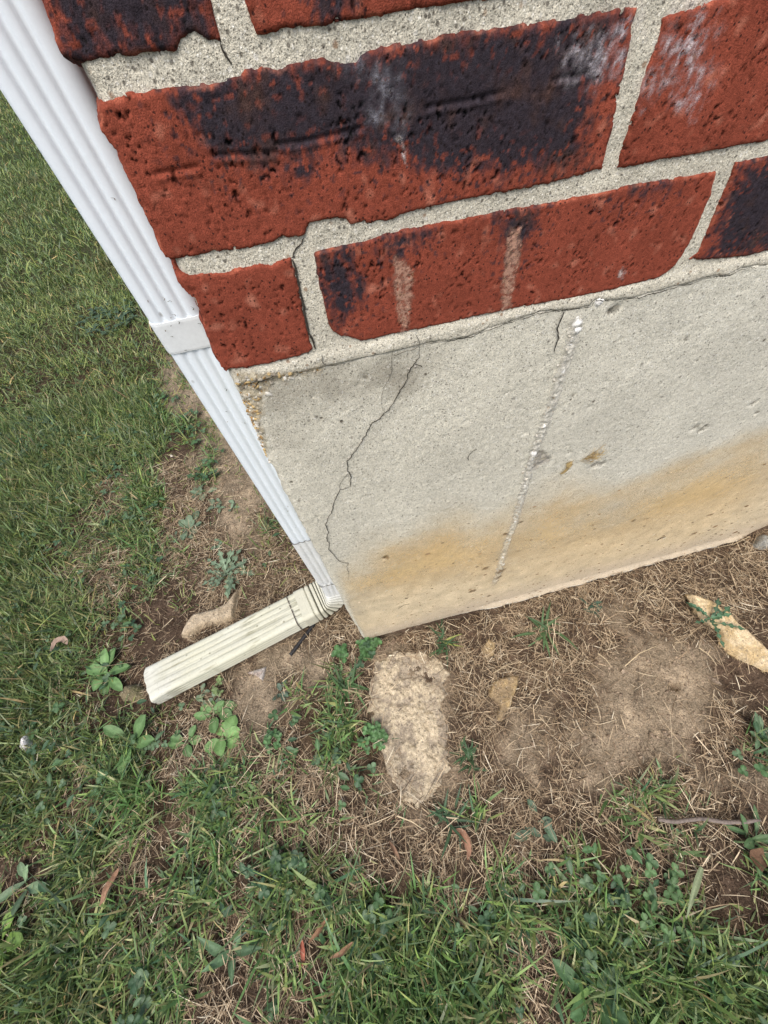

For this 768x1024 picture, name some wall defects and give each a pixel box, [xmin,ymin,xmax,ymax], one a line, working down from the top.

crack [325,265,765,576]